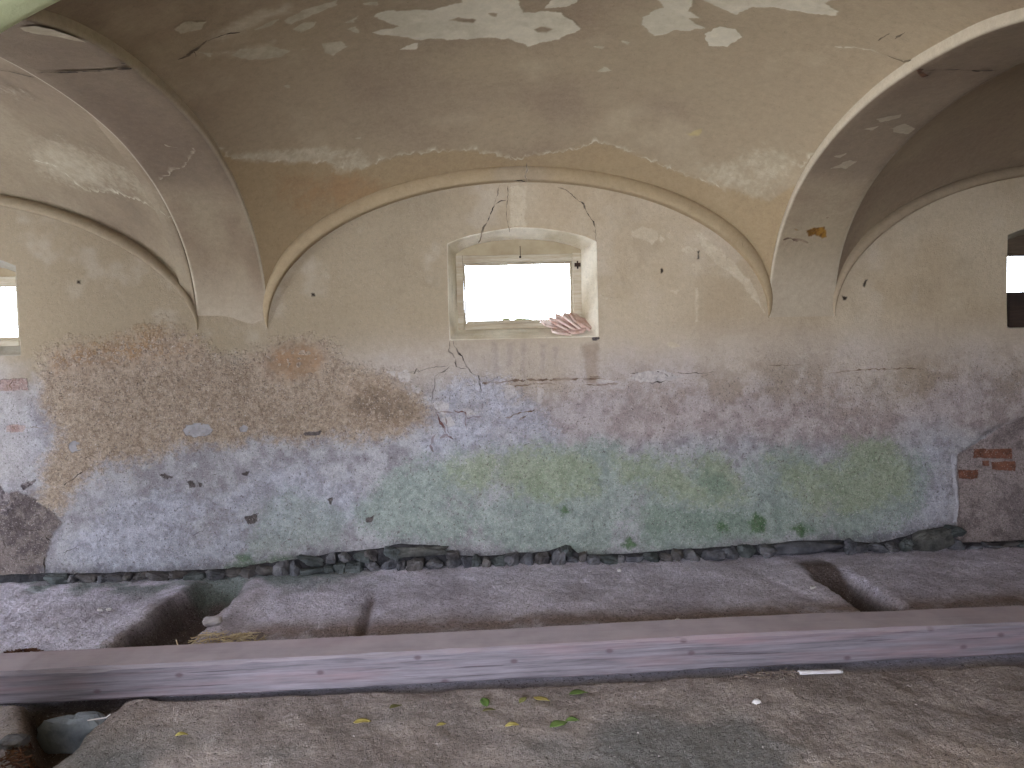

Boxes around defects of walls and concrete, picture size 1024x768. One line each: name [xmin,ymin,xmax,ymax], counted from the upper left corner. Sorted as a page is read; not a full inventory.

crack [1,63,132,78]
crack [178,32,240,60]
peeling [173,0,582,61]
peeling [640,0,840,47]
crack [478,164,529,243]
crack [558,187,597,242]
rust [793,226,828,240]
leakage [45,312,217,381]
crack [407,342,713,452]
peeling [0,324,477,575]
leakage [31,415,963,574]
flaking render [950,415,1024,543]